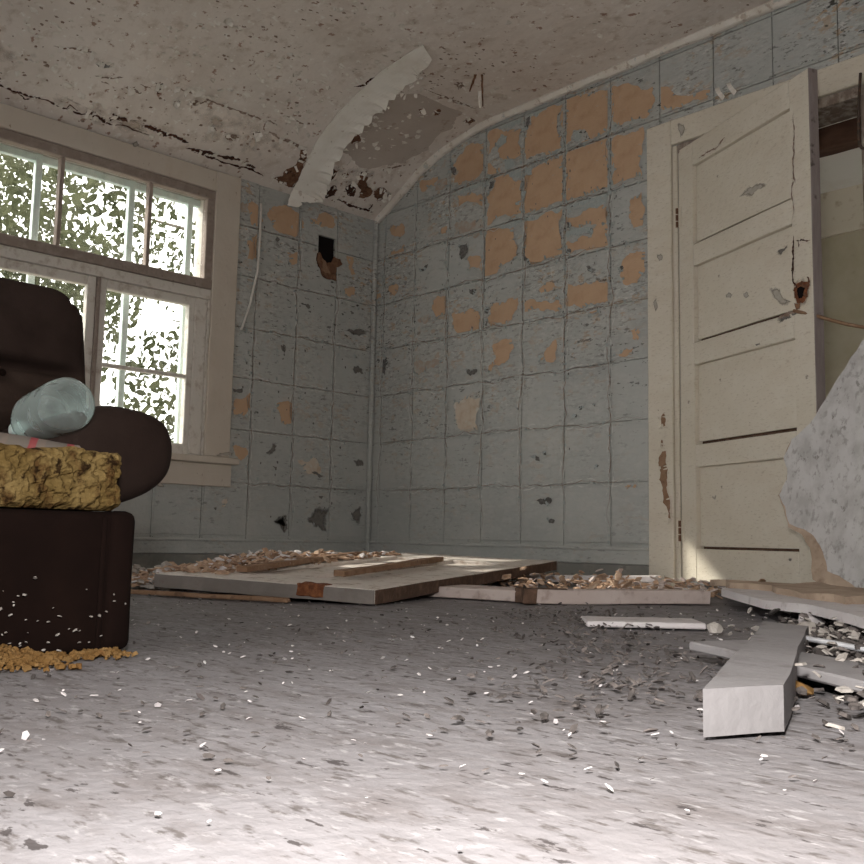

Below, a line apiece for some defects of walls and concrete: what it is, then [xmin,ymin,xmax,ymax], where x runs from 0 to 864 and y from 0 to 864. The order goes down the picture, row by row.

crack [55,45,308,150]
peeling [274,147,312,187]
peeling [325,38,517,206]
peeling [240,198,360,281]
peeling [414,83,710,373]
crack [0,83,648,544]
spalling [537,497,555,523]
peeling [657,413,673,523]